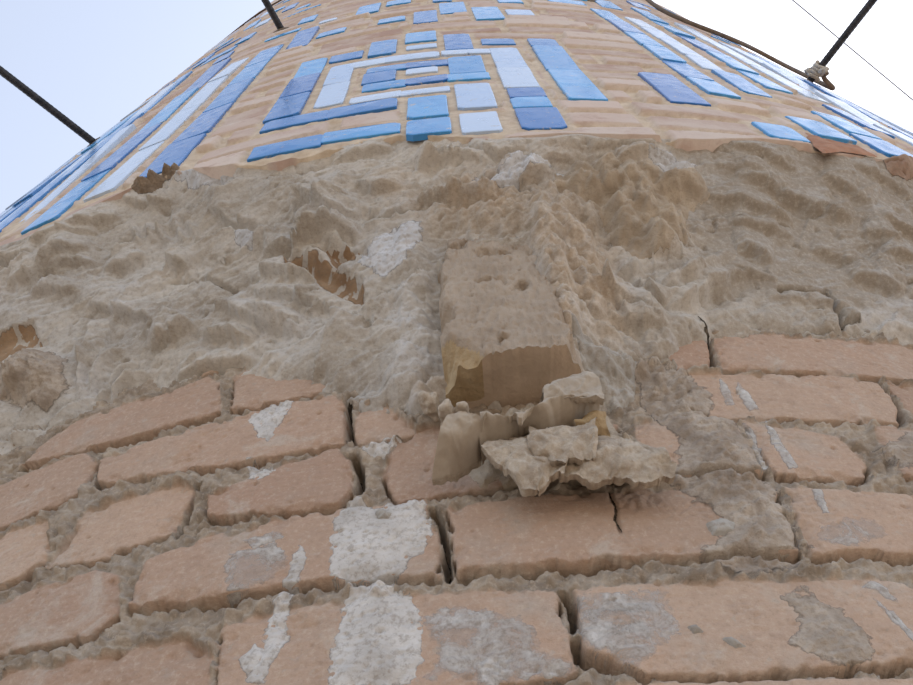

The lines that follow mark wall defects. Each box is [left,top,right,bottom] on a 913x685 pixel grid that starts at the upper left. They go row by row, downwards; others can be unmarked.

spalling [805,133,913,181]
spalling [131,162,180,194]
spalling [283,245,364,305]
spalling [0,325,43,362]
crack [698,316,710,350]
peeling [432,371,677,497]
crack [609,493,622,532]